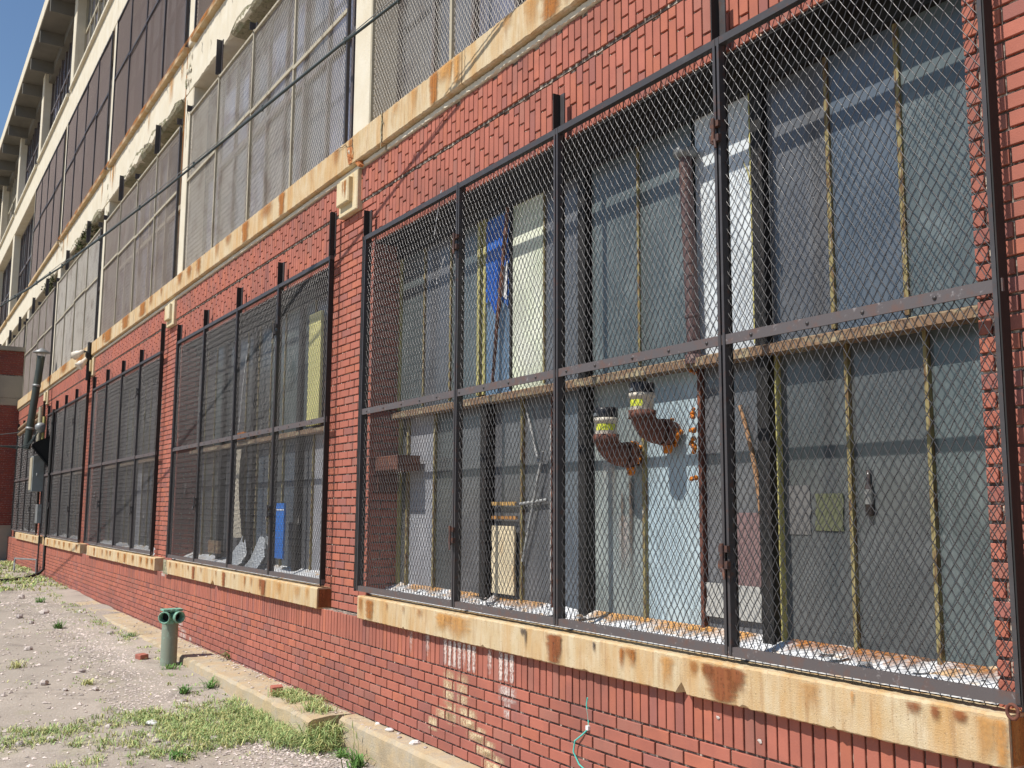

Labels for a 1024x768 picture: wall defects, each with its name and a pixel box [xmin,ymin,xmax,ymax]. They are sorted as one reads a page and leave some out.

rust [429,55,459,103]
rust [263,192,284,215]
rust [102,288,162,342]
rust [318,589,331,608]
rust [594,611,719,633]
rust [546,635,561,662]
rust [794,640,921,664]
leakage [429,639,502,768]
leakage [488,651,514,718]
rust [691,662,744,702]
rust [907,702,938,717]
rust [953,703,1024,767]